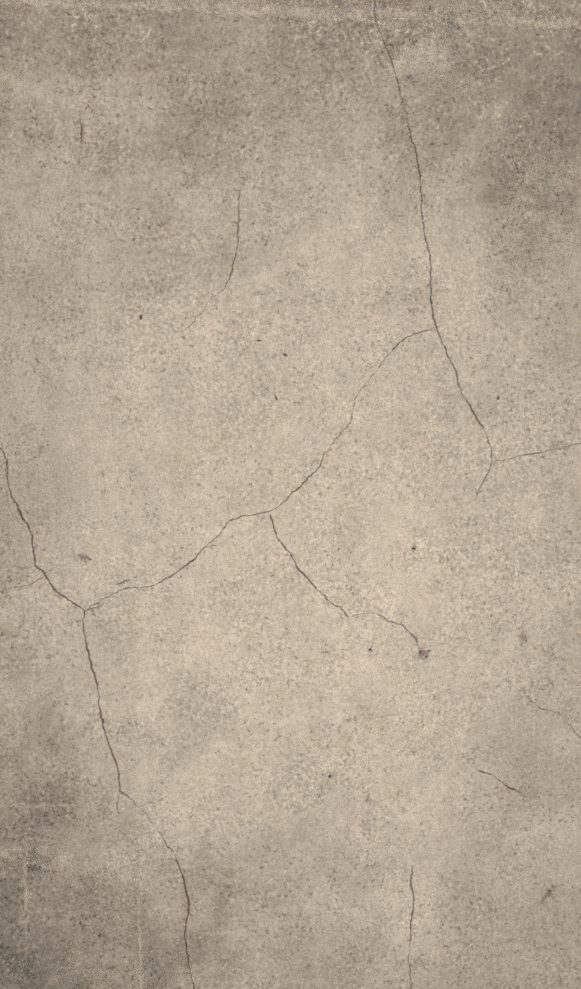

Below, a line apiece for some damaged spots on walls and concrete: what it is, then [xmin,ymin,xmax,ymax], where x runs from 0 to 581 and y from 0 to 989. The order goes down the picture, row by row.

crack [380,128,492,494]
crack [119,449,347,616]
crack [0,448,129,797]
crack [168,847,195,989]
crack [408,868,416,941]